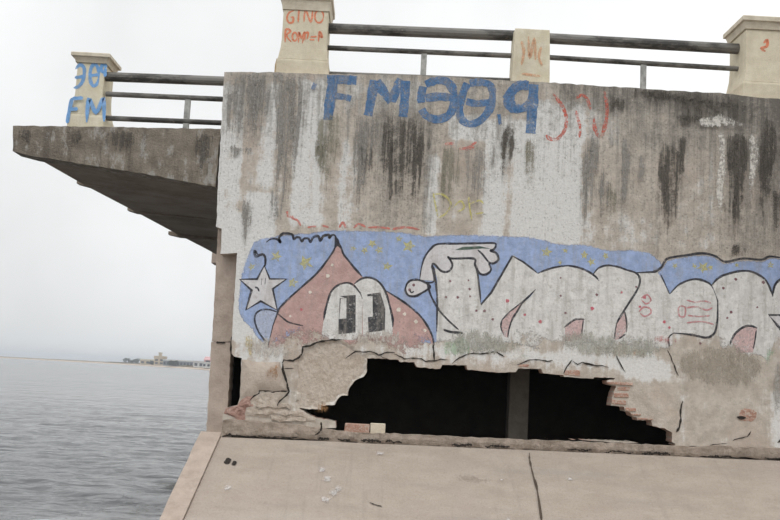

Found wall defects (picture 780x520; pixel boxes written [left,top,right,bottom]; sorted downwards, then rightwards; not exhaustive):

water stain [227,73,305,218]
water stain [315,114,340,179]
water stain [353,117,430,202]
water stain [439,126,514,207]
water stain [634,89,780,232]
flaking render [224,343,384,422]
crack [226,422,402,444]
crack [452,441,510,449]
crack [568,448,670,456]
flaking render [603,382,653,420]
flaking render [737,408,757,422]
crack [529,453,542,520]